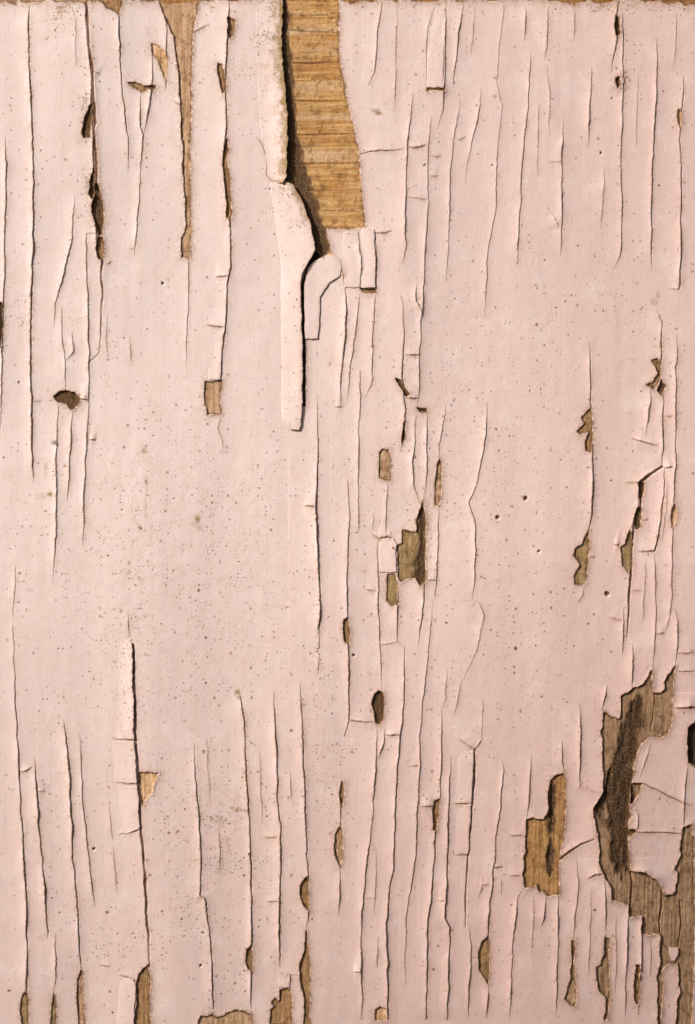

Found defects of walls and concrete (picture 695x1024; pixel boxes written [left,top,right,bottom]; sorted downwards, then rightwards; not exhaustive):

crack [12,564,119,1024]
crack [0,0,157,547]
peeling [101,612,160,1024]
crack [204,1,237,455]
crack [193,287,375,1024]
peeling [256,0,406,430]
peeling [349,407,448,1021]
crack [373,403,506,1022]
crack [368,2,695,861]
peeling [509,741,567,1019]
peeling [573,343,596,604]
peeling [564,666,695,1024]